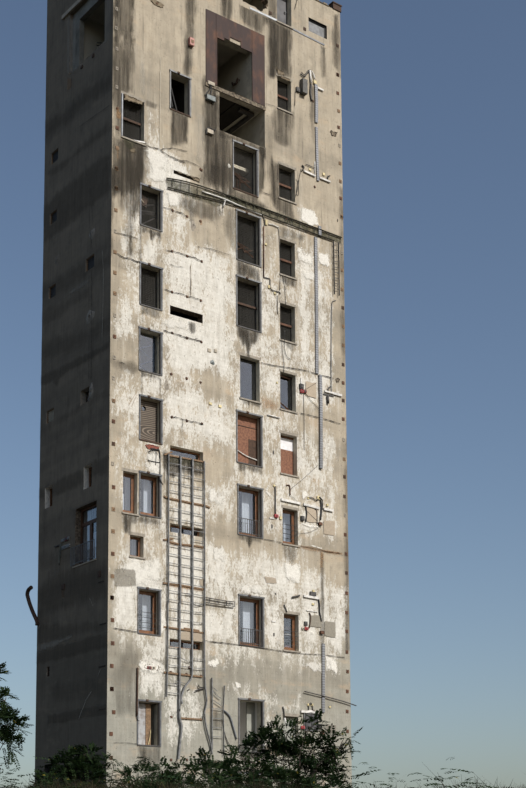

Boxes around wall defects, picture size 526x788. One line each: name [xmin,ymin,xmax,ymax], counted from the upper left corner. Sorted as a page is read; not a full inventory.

spalling [237,0,268,18]
water stain [248,0,291,77]
water stain [113,0,134,123]
peeling [146,147,201,182]
peeling [301,208,318,226]
peeling [297,247,330,280]
water stain [238,327,258,354]
peeling [145,444,162,474]
peeling [115,557,161,589]
peeling [181,631,202,642]
peeling [309,615,336,637]
peeling [306,656,337,673]